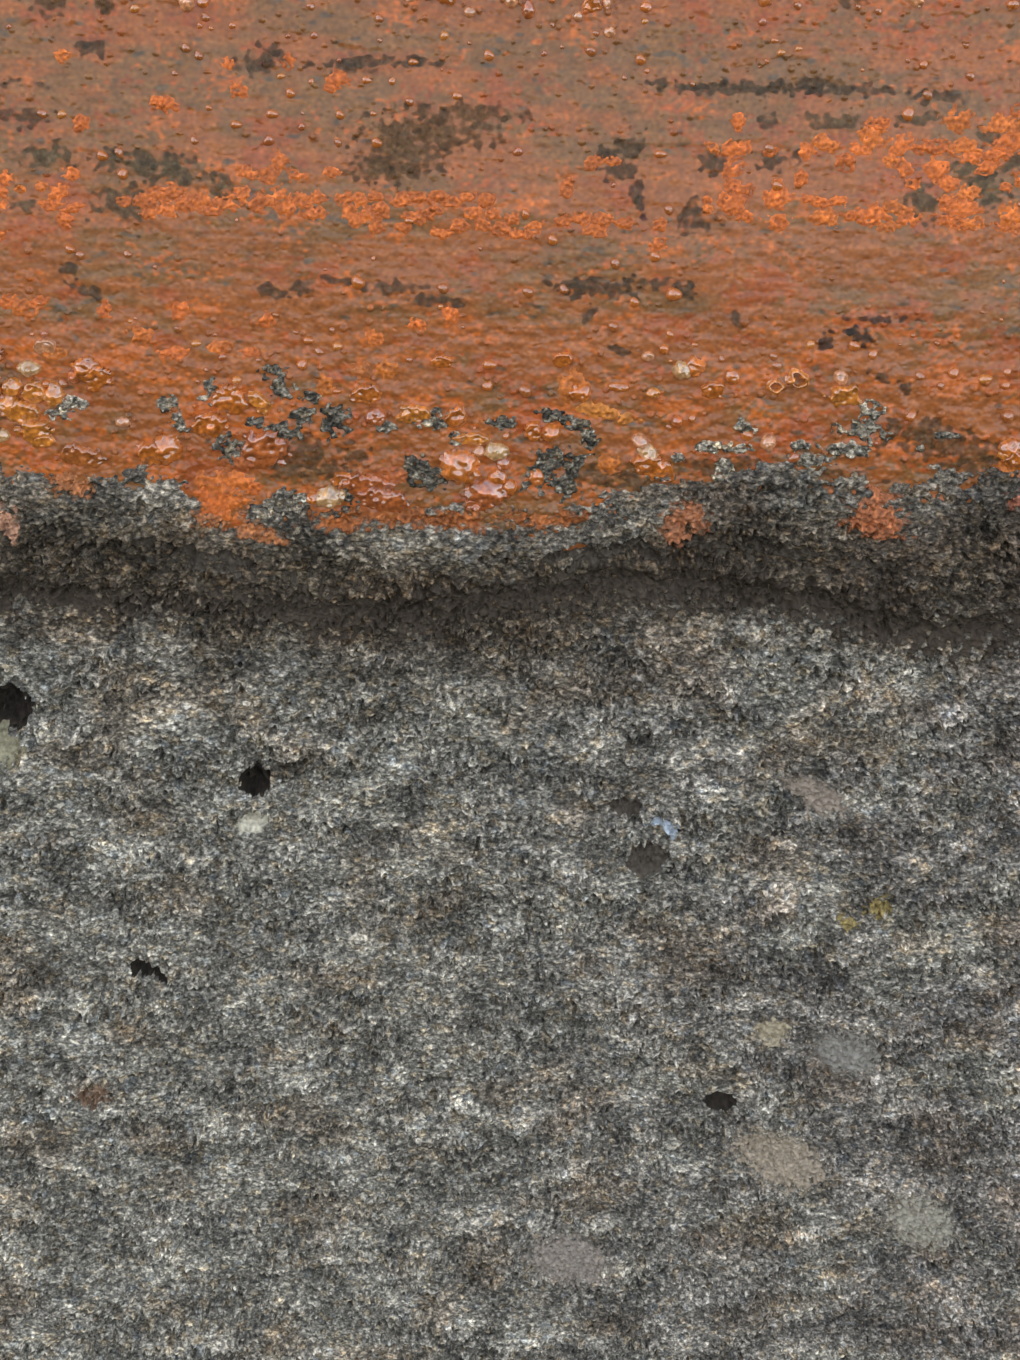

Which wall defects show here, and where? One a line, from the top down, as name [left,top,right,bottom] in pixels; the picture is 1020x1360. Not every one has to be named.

corrosion [0,164,86,230]
corrosion [116,147,636,240]
corrosion [701,102,1020,236]
corrosion [0,338,115,500]
corrosion [190,383,295,546]
corrosion [306,329,591,538]
corrosion [552,352,675,483]
corrosion [641,344,741,399]
corrosion [766,368,863,408]
corrosion [997,438,1020,477]
corrosion [658,501,712,548]
corrosion [836,485,917,541]